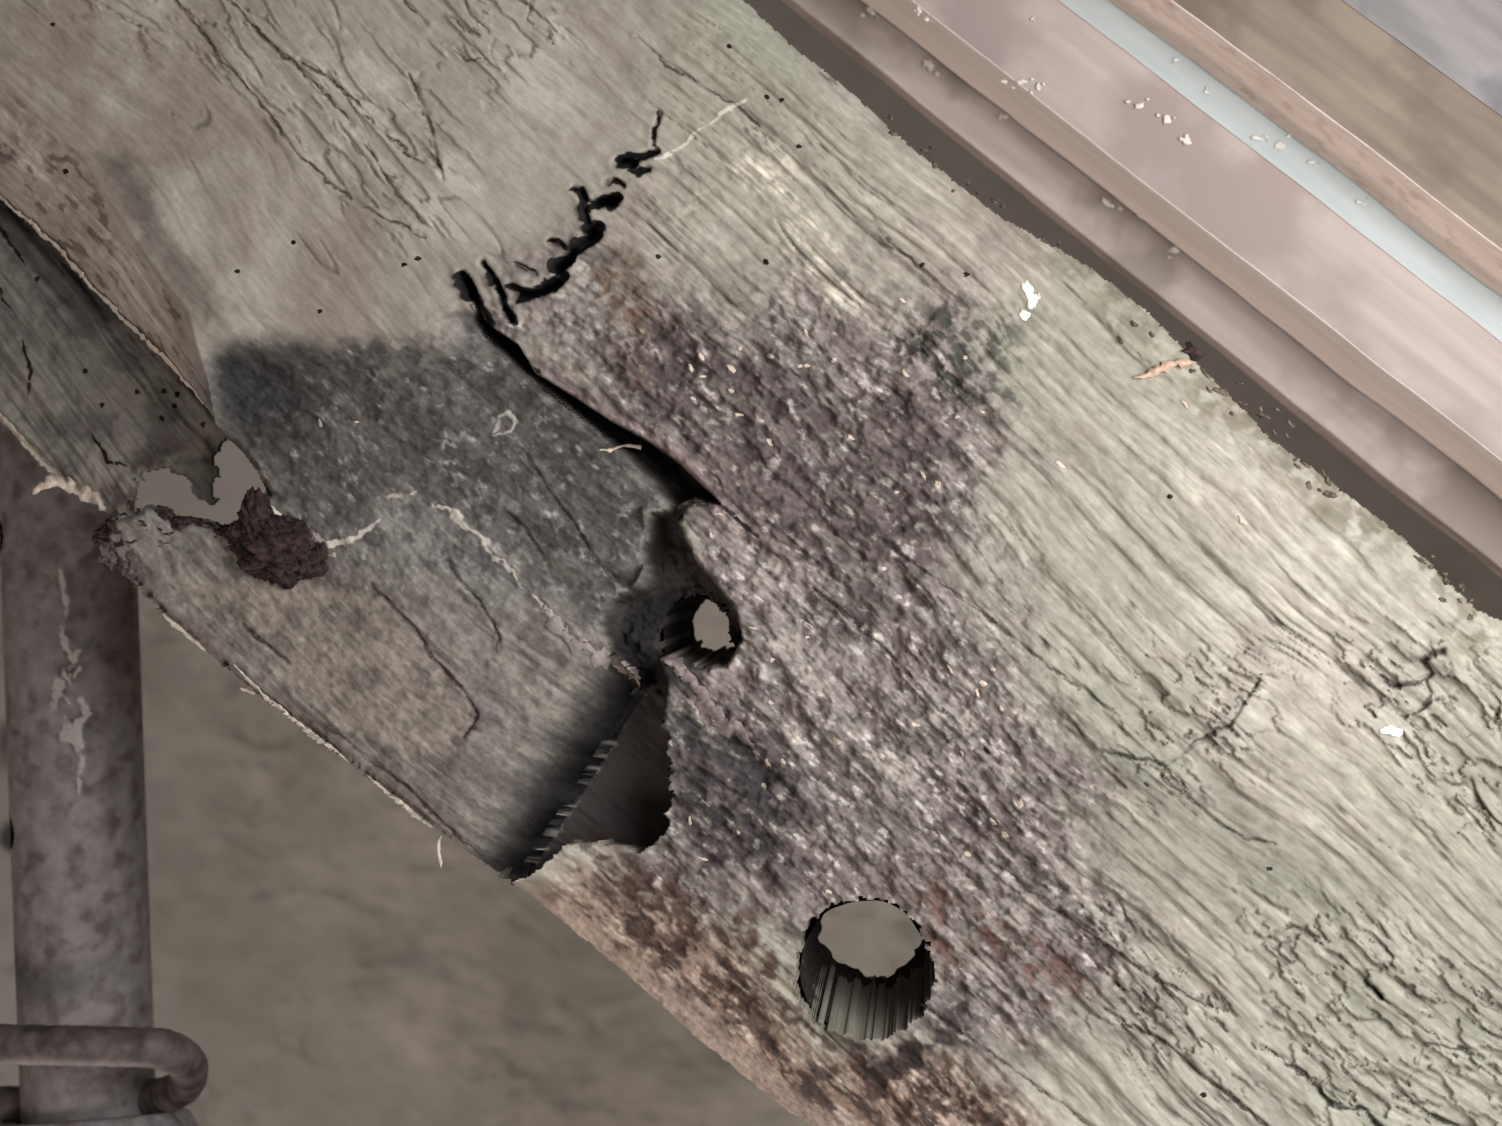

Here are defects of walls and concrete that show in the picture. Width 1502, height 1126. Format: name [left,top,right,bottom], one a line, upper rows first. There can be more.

crack [233,3,438,238]
crack [453,111,759,538]
peeling [313,519,380,557]
leakage [221,343,705,686]
peeling [432,504,517,580]
leakage [605,345,942,597]
peeling [533,595,641,689]
peeling [660,656,755,748]
crack [1382,649,1444,716]
leakage [665,705,797,880]
crack [1272,1051,1379,1126]
crack [1411,1101,1460,1126]